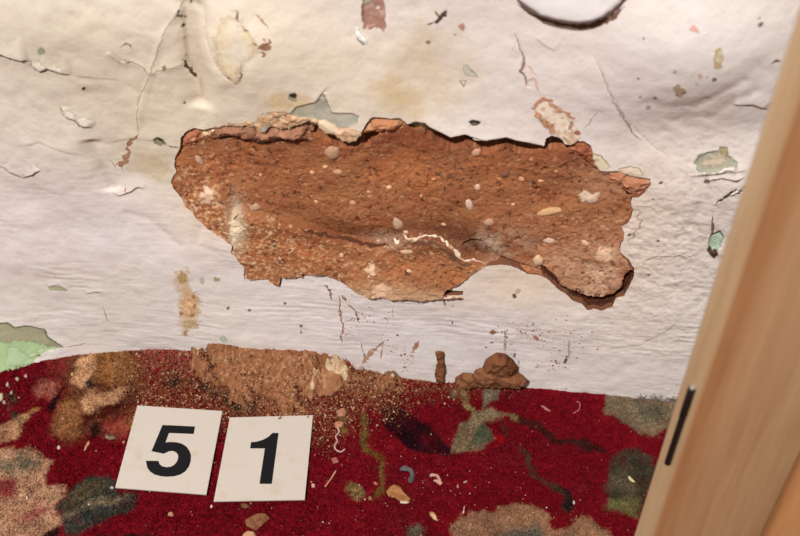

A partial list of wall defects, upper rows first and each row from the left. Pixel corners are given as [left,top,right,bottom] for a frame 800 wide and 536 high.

crack [0,48,66,75]
crack [113,0,198,132]
peeling [212,10,271,84]
flaking render [355,0,386,45]
crack [512,34,541,96]
peeling [693,147,738,183]
spalling [153,93,651,306]
peeling [707,215,723,258]
peeling [0,322,89,405]